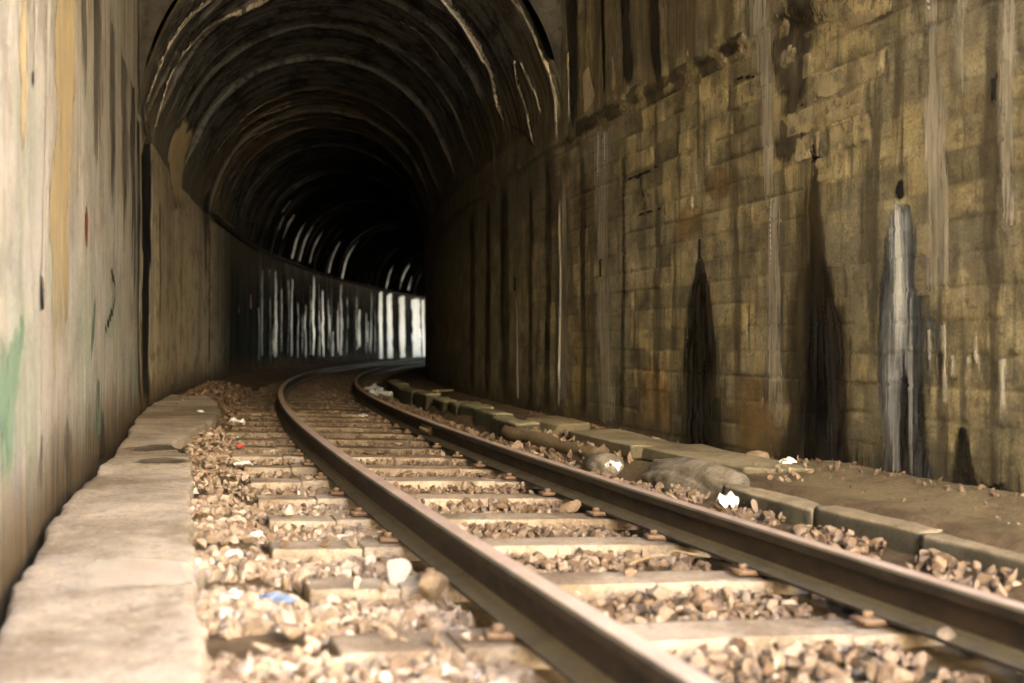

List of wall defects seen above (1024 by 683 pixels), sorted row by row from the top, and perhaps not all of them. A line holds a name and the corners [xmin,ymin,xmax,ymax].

leakage [441,0,505,122]
leakage [511,0,578,139]
leakage [620,0,634,84]
leakage [999,0,1016,226]
leakage [681,239,726,449]
leakage [749,0,850,463]
leakage [877,0,949,480]
leakage [951,428,1011,492]